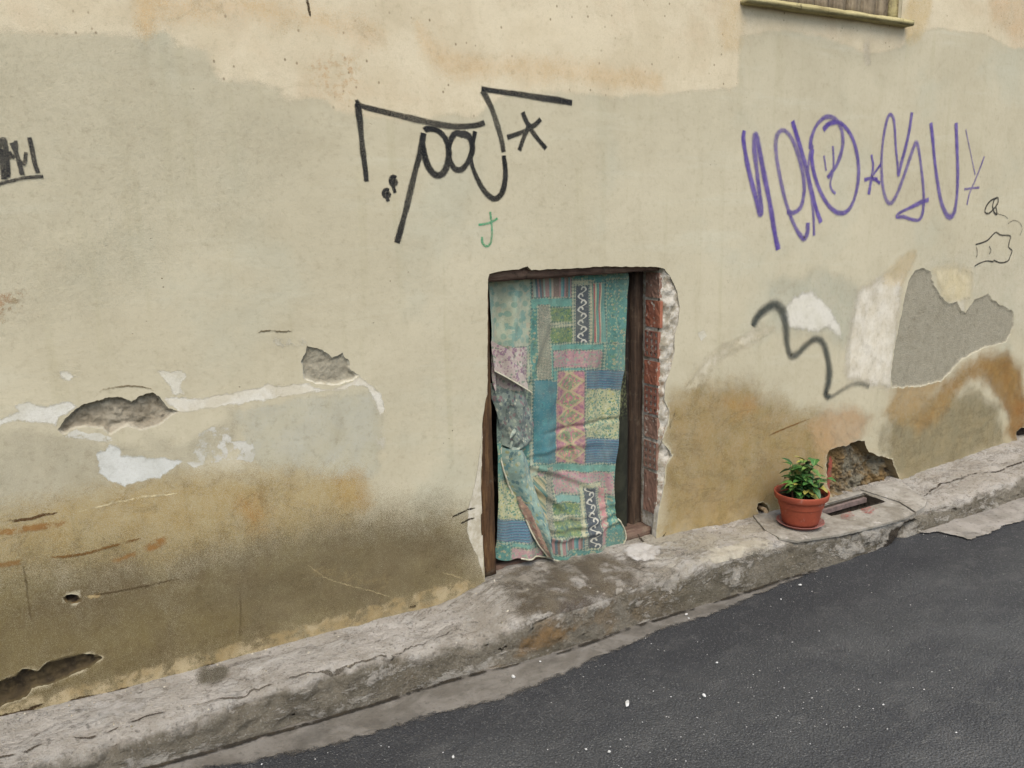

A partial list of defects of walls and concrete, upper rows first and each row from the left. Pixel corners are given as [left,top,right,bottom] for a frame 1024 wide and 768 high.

flaking render [780,268,1014,392]
flaking render [0,346,386,487]
flaking render [641,268,769,538]
water stain [656,364,1004,536]
flaking render [826,440,899,497]
crack [924,460,1024,496]
flaking render [0,576,475,715]
water stain [0,457,485,714]